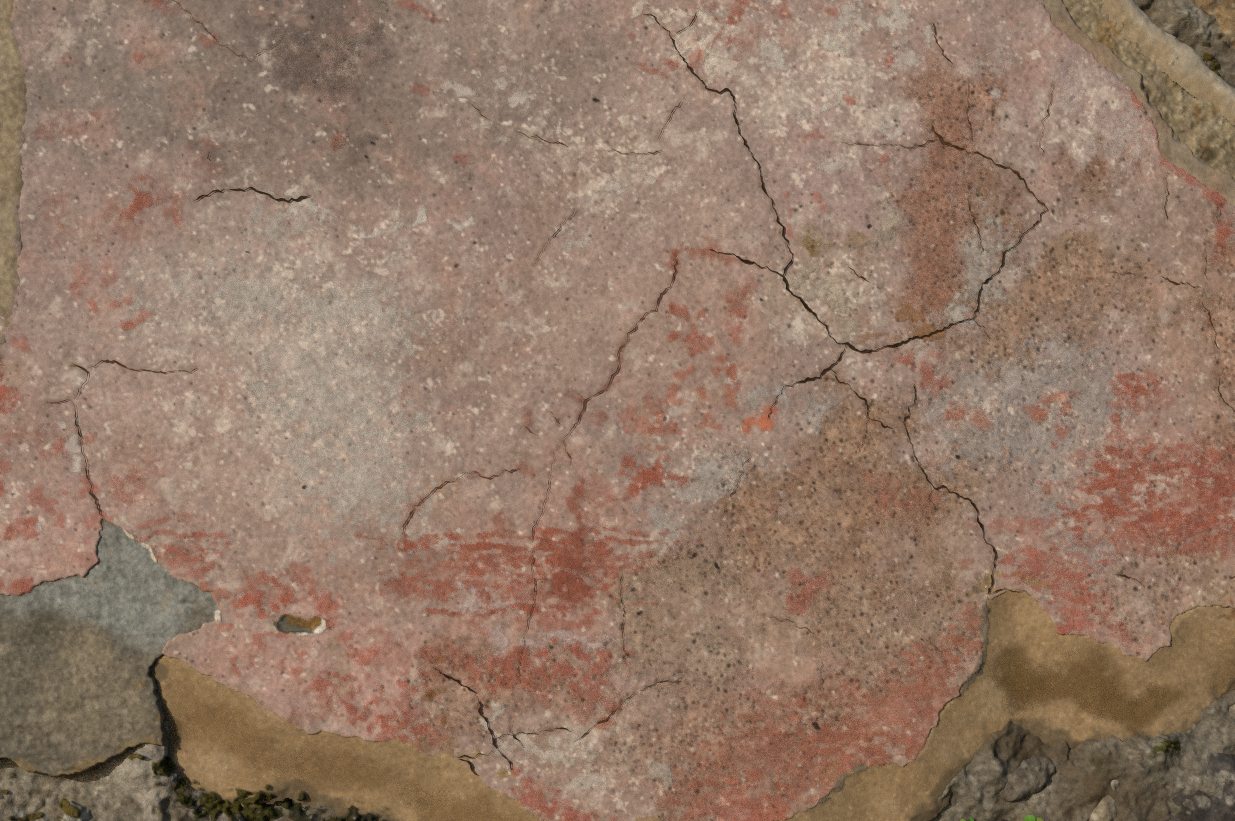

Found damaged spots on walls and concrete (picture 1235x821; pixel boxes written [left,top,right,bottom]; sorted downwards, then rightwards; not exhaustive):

crack [194,187,311,202]
crack [533,211,575,266]
crack [607,9,1054,599]
crack [1162,257,1217,347]
crack [45,359,197,520]
spalling [124,530,156,562]
crack [402,468,518,534]
crack [518,256,677,683]
spalling [714,394,989,730]
spalling [273,616,316,633]
spalling [419,636,605,744]
crack [432,572,677,775]